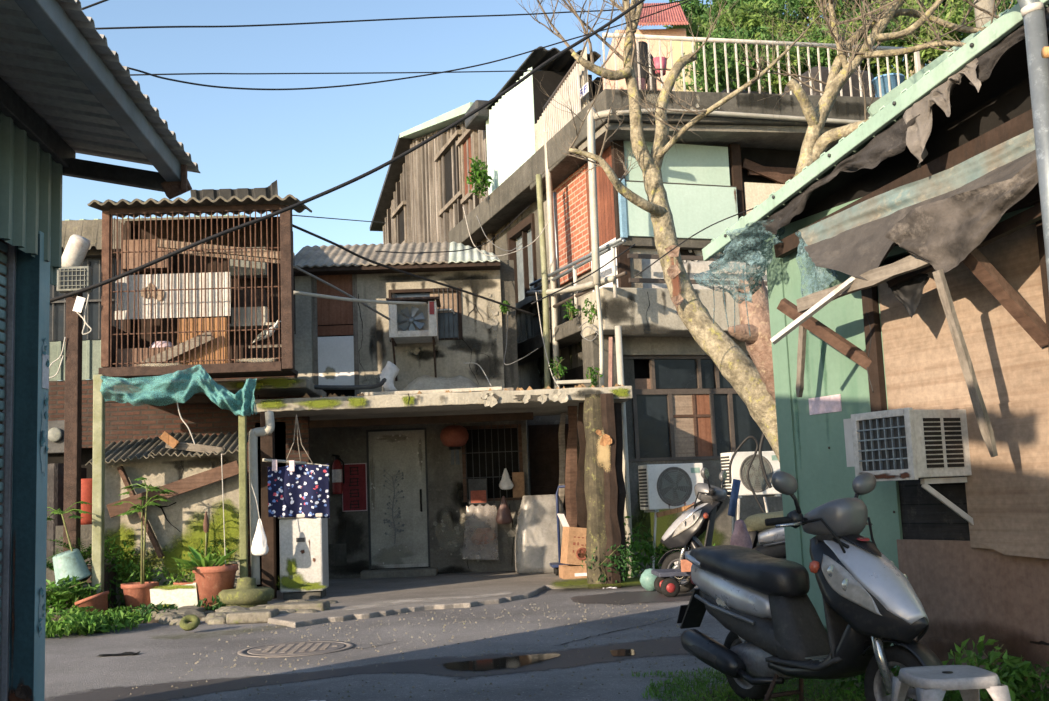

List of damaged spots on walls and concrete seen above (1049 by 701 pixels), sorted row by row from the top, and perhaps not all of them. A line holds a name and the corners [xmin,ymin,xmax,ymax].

leakage [385,274,432,290]
leakage [369,321,386,360]
leakage [412,273,503,380]
leakage [600,295,670,335]
leakage [573,389,600,397]
rust [8,683,32,701]